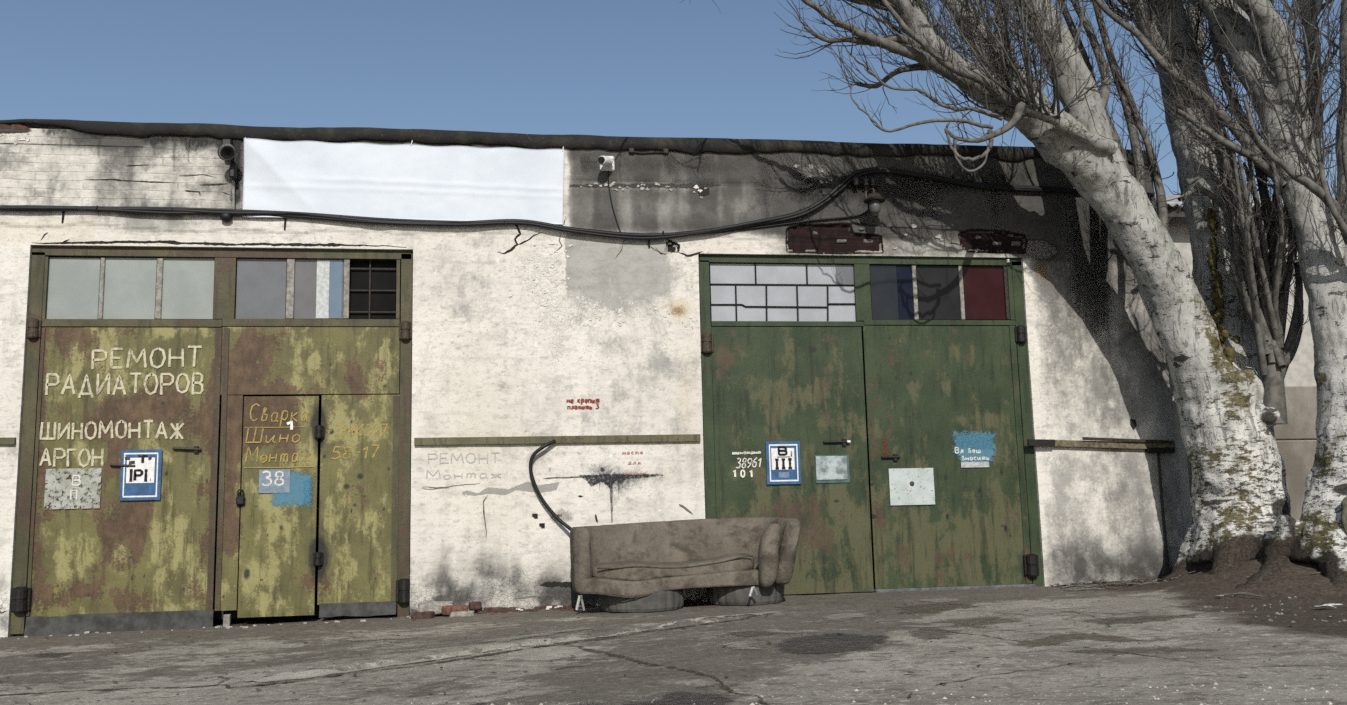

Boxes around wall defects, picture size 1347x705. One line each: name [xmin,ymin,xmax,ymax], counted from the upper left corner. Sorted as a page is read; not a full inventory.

damp [145,135,241,203]
crack [0,611,783,704]